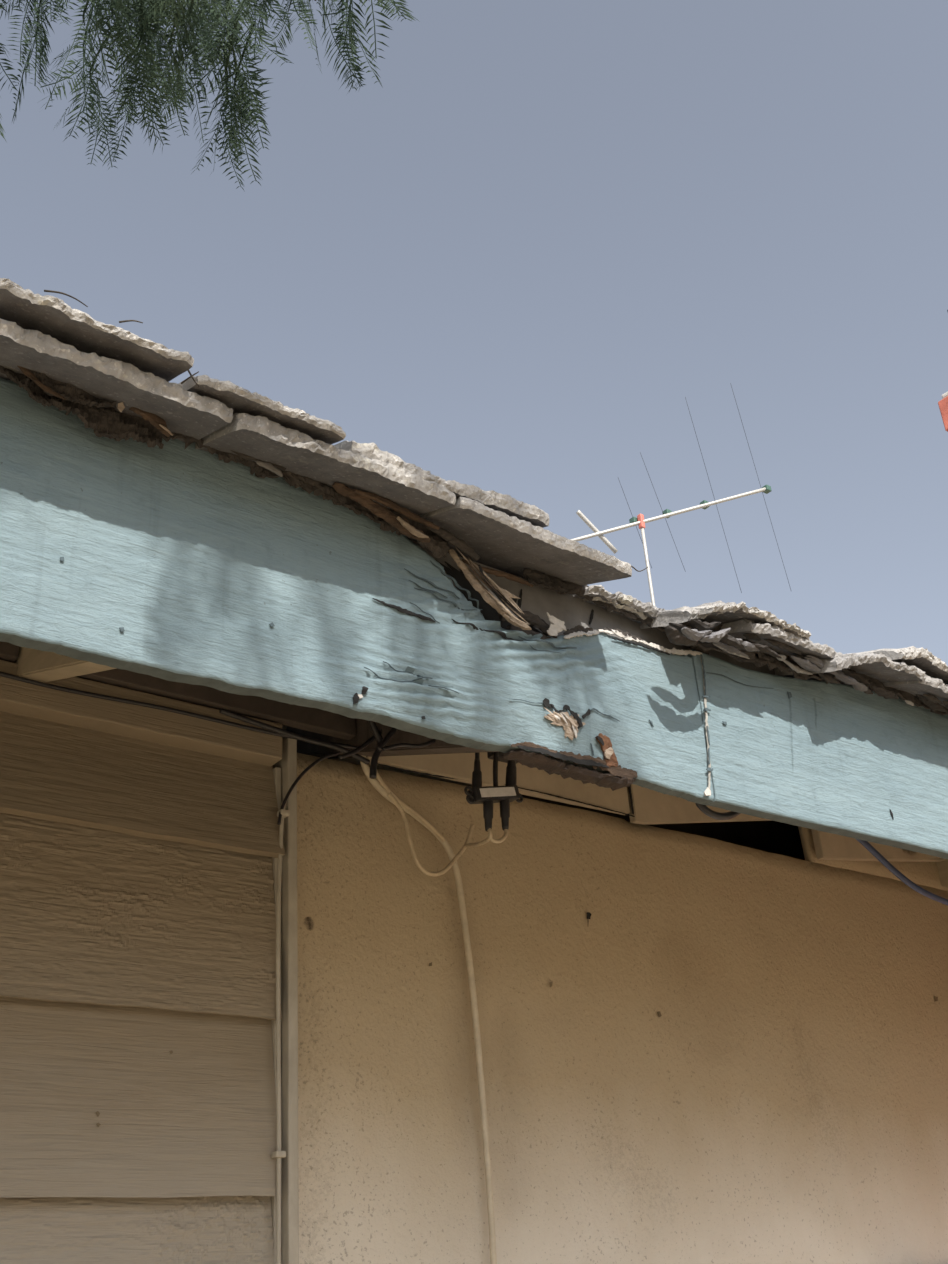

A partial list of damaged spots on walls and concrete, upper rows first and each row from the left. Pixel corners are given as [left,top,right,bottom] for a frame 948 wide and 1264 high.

spalling [436,560,567,639]
crack [515,589,523,609]
peeling [513,698,619,740]